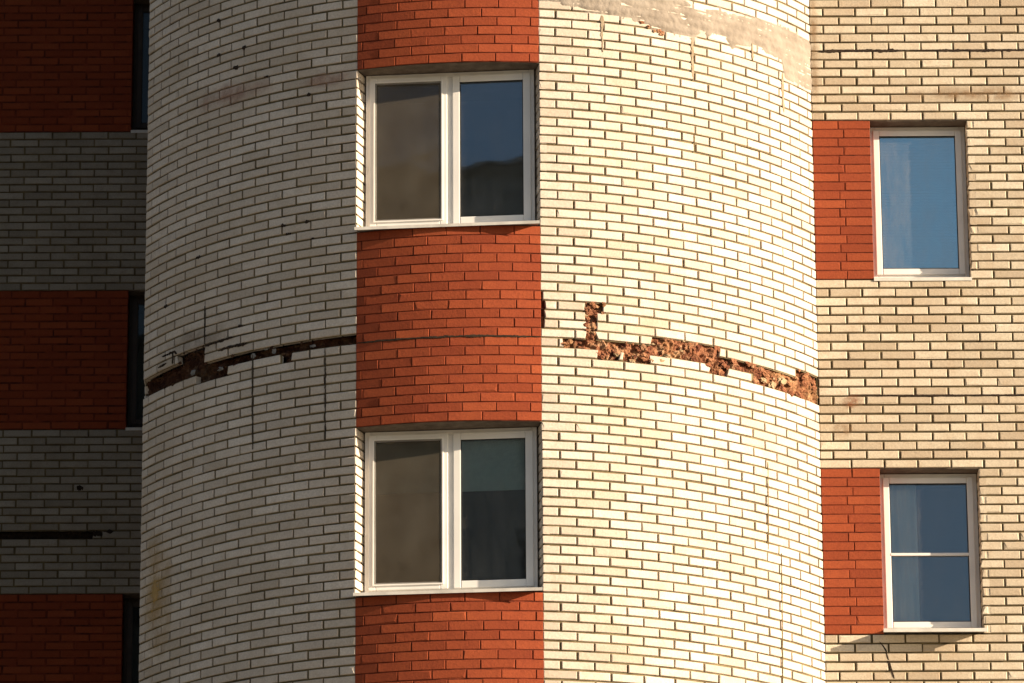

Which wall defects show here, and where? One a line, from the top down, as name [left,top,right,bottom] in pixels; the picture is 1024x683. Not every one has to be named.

spalling [147,336,357,396]
spalling [561,301,818,404]
crack [0,529,113,539]